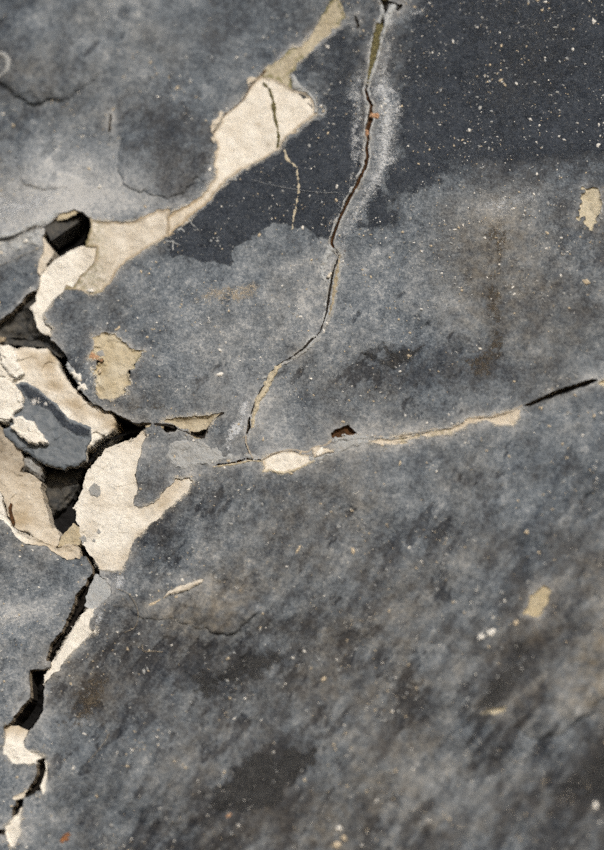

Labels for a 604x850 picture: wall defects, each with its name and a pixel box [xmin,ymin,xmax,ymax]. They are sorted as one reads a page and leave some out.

flaking render [30,0,366,341]
crack [88,0,604,475]
peeling [354,0,604,234]
flaking render [66,332,145,405]
crack [0,550,112,850]
flaking render [73,424,195,573]
flaking render [523,586,551,617]